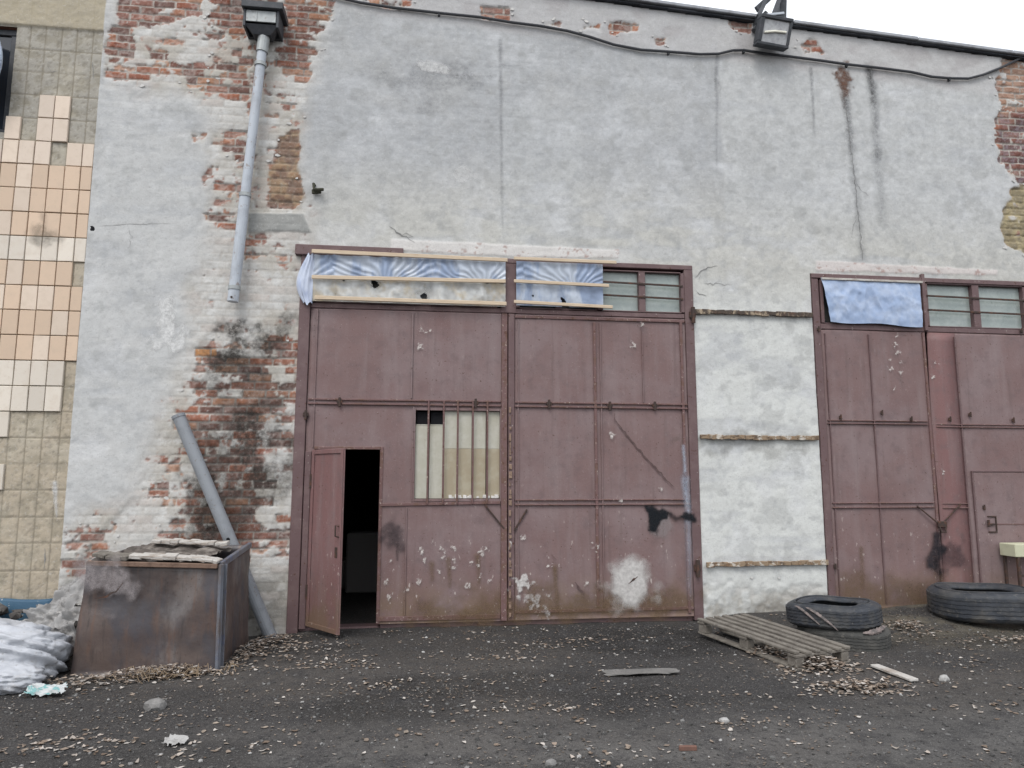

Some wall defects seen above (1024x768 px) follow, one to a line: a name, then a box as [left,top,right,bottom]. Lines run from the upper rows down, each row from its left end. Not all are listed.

spalling [477,4,514,21]
spalling [541,17,562,28]
spalling [579,18,669,47]
flaking render [0,0,335,210]
spalling [989,57,1024,256]
spalling [147,297,298,573]
peeling [515,574,529,598]